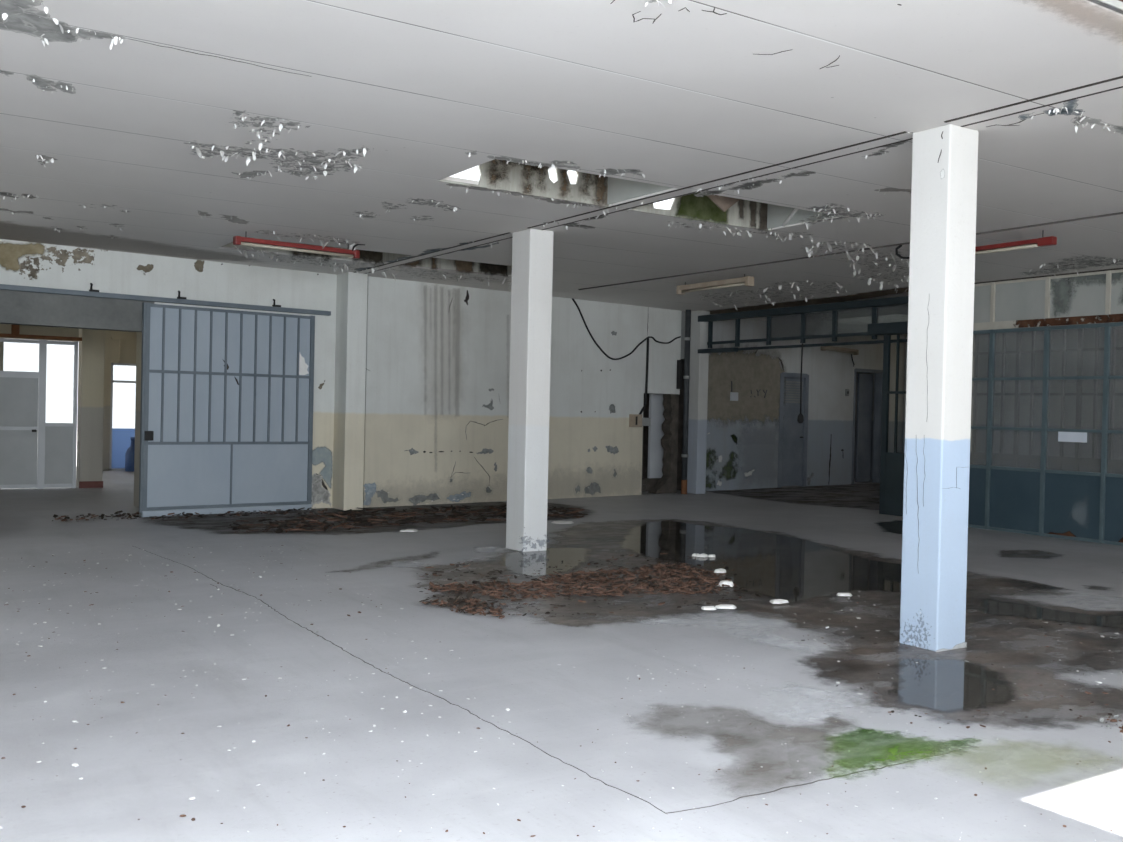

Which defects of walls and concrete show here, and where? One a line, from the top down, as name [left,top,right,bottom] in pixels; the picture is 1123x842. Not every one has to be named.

peeling [0,0,127,50]
peeling [0,70,75,94]
peeling [1018,99,1123,134]
peeling [184,110,374,180]
peeling [0,192,129,280]
peeling [363,479,471,506]